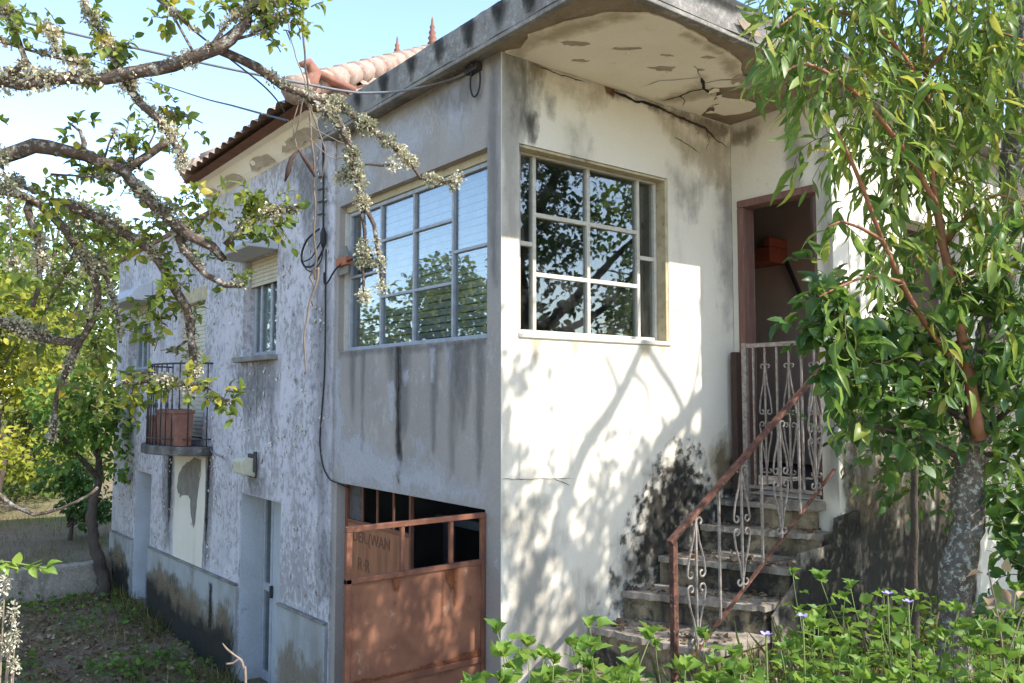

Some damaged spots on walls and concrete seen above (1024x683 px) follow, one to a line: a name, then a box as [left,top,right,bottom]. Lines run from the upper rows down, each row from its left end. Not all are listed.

water stain [521,63,535,137]
peeling [561,41,590,64]
crack [535,65,728,152]
peeling [647,54,675,75]
peeling [166,243,328,610]
water stain [333,347,468,496]
peeling [115,409,238,568]
water stain [145,564,235,681]